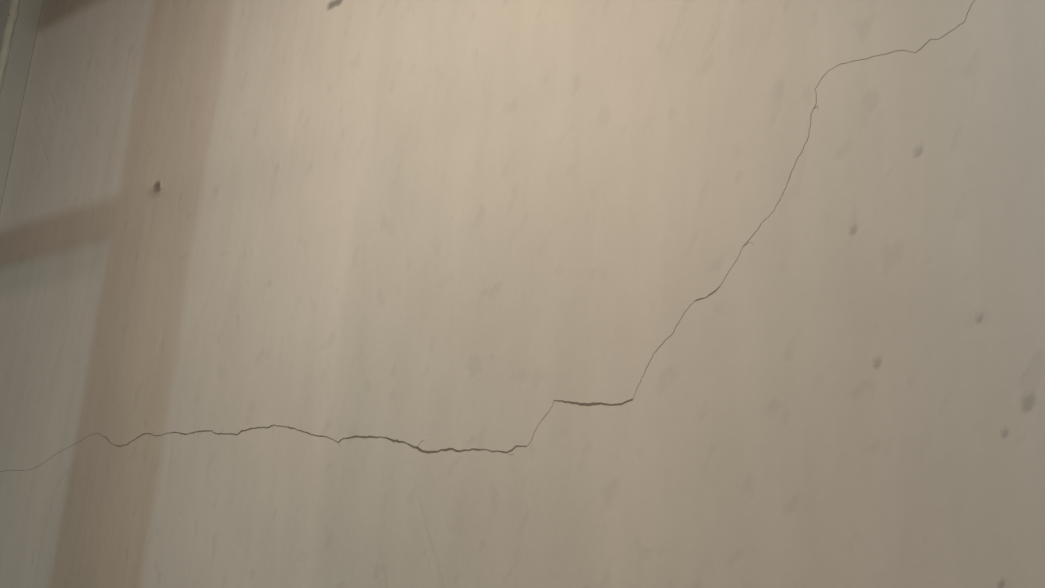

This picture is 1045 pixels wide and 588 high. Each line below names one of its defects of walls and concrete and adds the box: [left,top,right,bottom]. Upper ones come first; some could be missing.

crack [0,0,975,472]